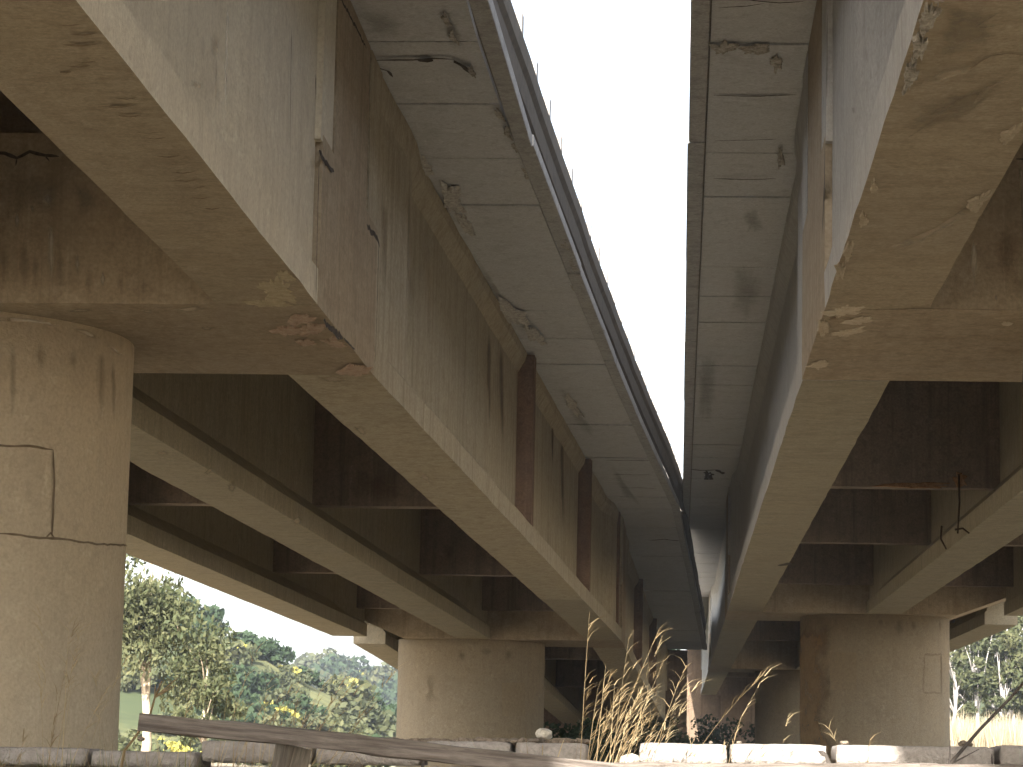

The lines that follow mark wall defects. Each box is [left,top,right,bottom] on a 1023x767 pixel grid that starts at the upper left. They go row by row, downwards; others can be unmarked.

crack [0,150,59,164]
spalling [242,270,347,348]
spalling [817,304,874,337]
crack [0,444,127,547]